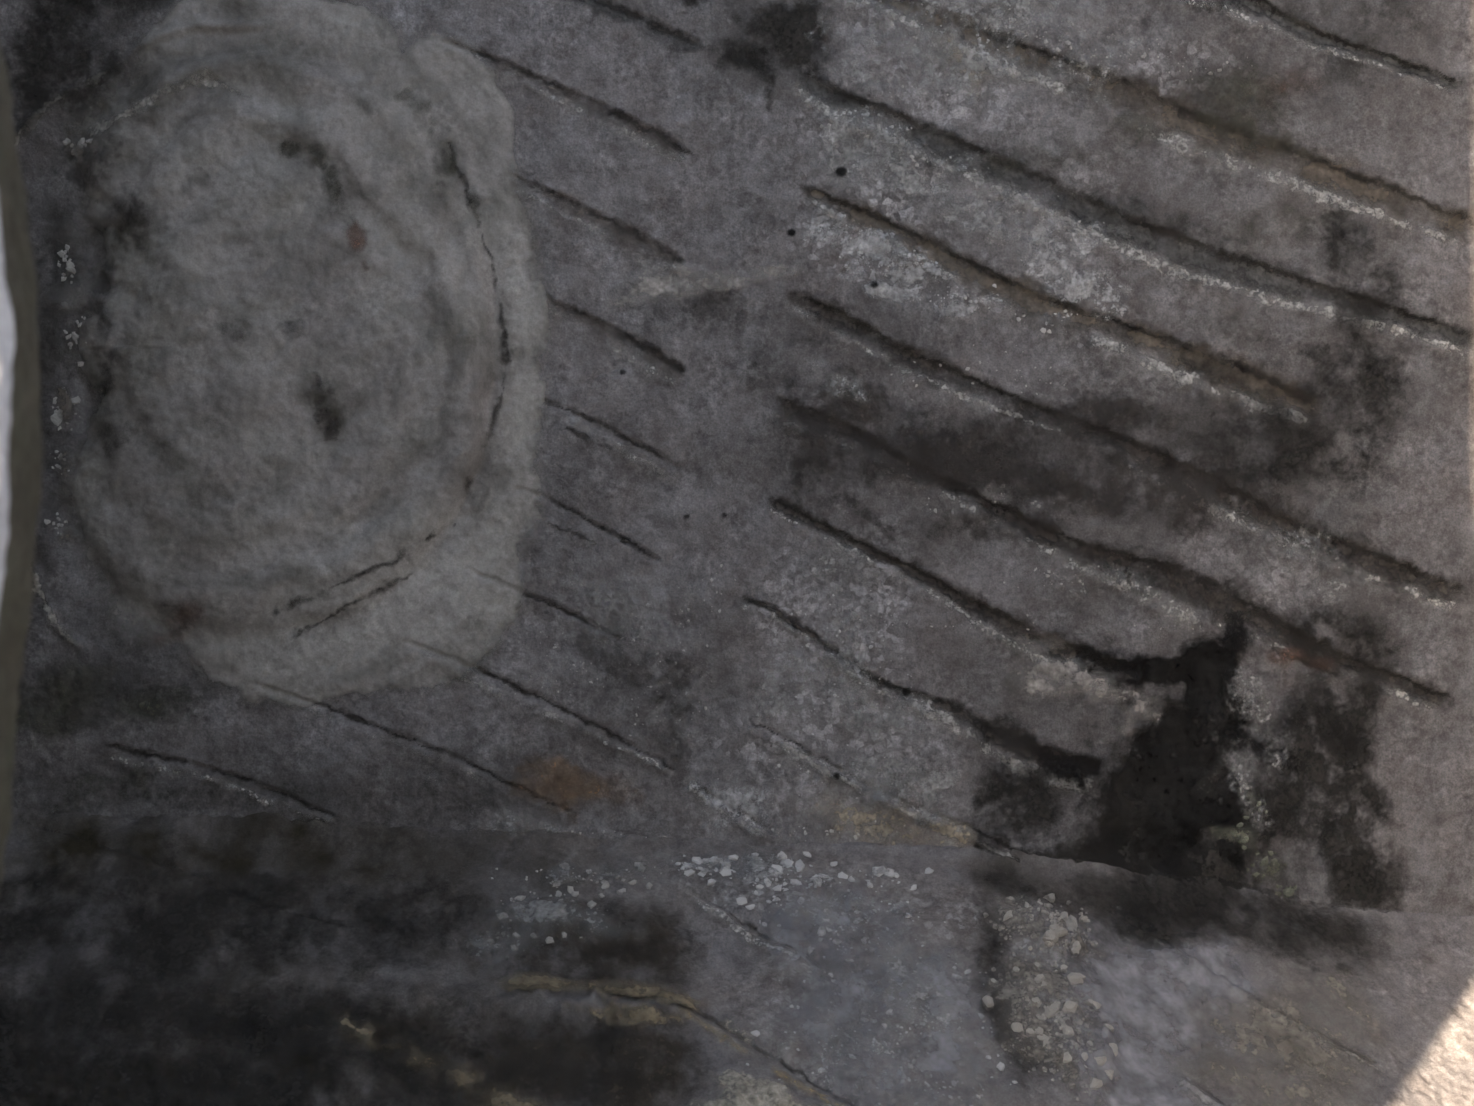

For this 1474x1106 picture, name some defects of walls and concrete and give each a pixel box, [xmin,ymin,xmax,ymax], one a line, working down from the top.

water stain [5,0,119,132]
crack [470,50,687,162]
crack [575,0,702,51]
water stain [721,0,883,108]
water stain [870,0,1087,97]
crack [803,187,1318,423]
crack [798,69,1473,356]
crack [850,0,1471,244]
crack [769,396,1444,708]
crack [789,294,1462,609]
crack [744,598,1095,794]
water stain [0,866,698,1106]